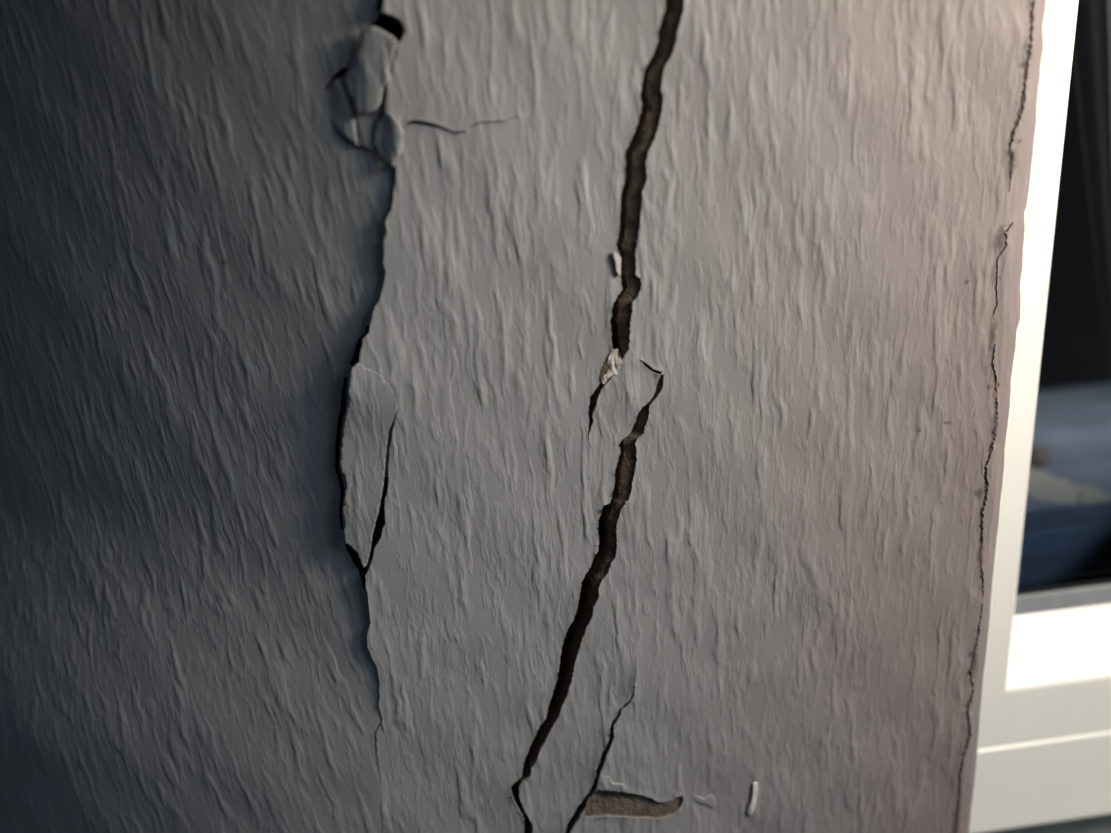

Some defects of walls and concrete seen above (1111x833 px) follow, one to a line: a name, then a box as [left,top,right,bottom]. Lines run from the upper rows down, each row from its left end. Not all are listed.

peeling [325,26,404,167]
crack [407,116,518,134]
crack [1007,0,1035,192]
crack [992,222,1014,317]
peeling [341,363,398,568]
crack [511,0,684,833]
crack [954,344,998,833]
spalling [583,776,716,819]